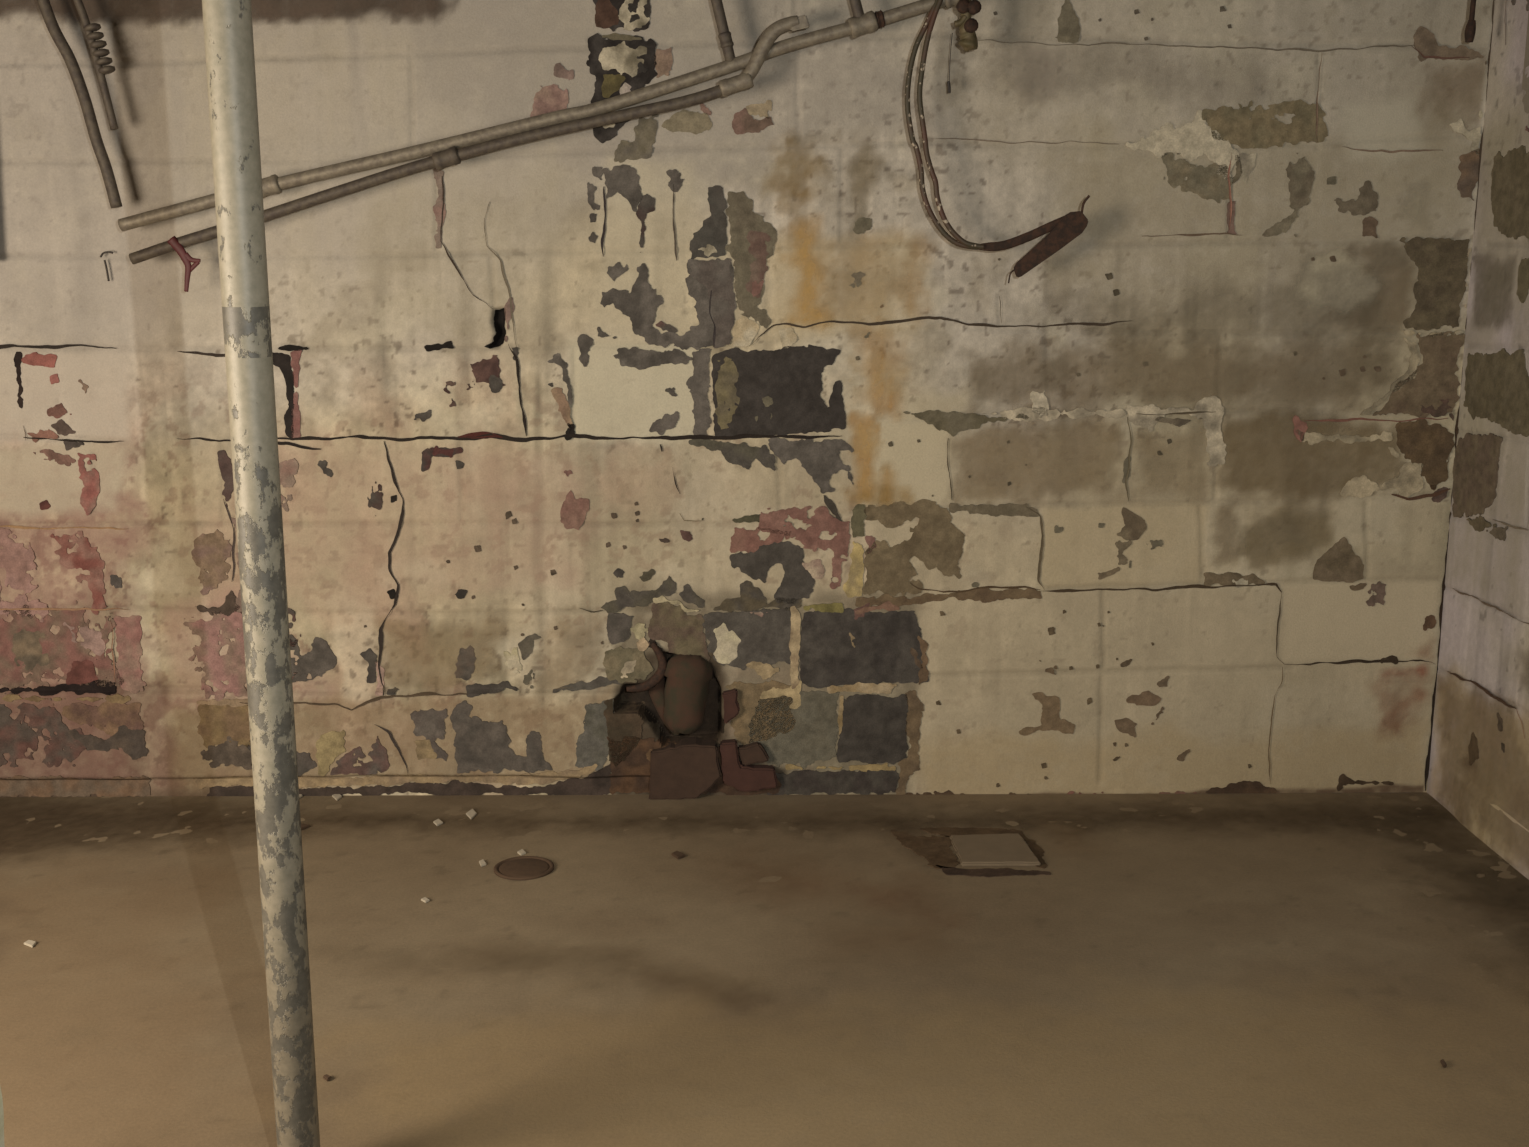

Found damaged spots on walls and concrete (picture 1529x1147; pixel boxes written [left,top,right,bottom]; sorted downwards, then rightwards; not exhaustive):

water stain [1125,110,1256,195]
peeling [1161,99,1378,238]
crack [0,342,117,350]
crack [23,436,119,444]
crack [177,350,225,358]
peeling [443,297,515,407]
crack [272,168,840,773]
peeling [547,103,1039,800]
crack [751,296,1132,345]
water stain [982,248,1513,500]
peeling [1373,237,1529,541]
peeling [410,700,553,774]